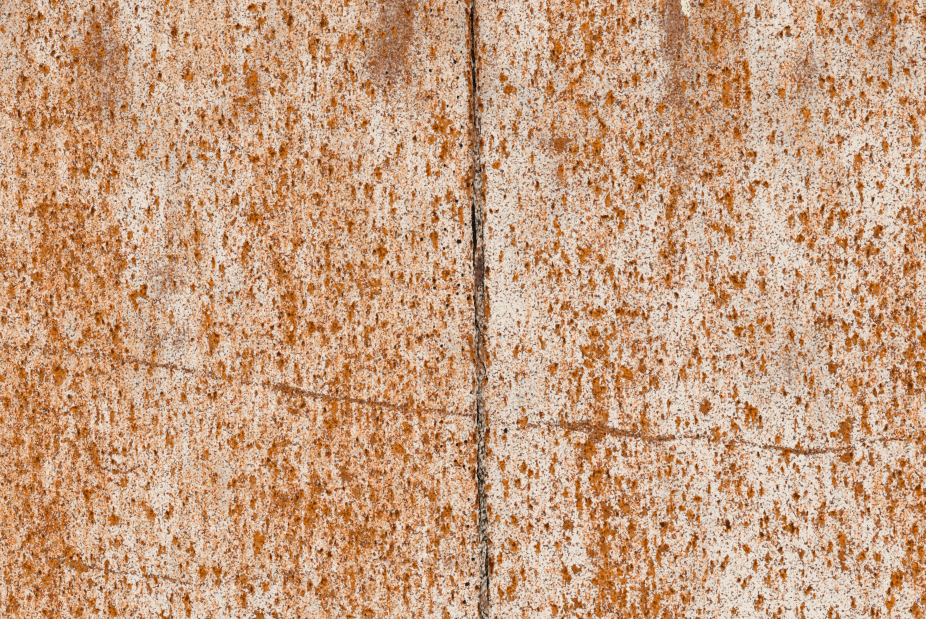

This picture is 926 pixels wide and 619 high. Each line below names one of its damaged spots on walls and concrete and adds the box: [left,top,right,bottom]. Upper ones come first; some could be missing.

rust [0,0,220,619]
rust [143,0,551,619]
crack [469,0,489,619]
rust [522,0,926,619]